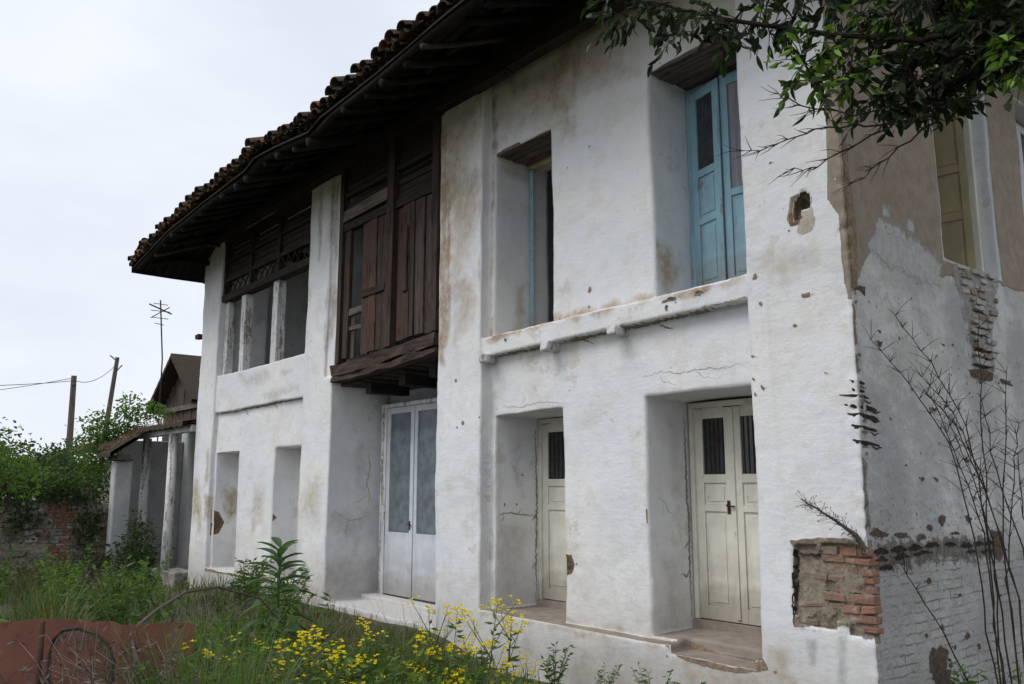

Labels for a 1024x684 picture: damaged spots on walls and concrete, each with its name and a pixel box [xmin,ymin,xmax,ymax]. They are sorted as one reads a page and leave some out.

leakage [439,235,450,361]
peeling [788,206,815,234]
flaking render [822,0,1024,540]
crack [499,430,538,591]
spalling [790,537,861,557]